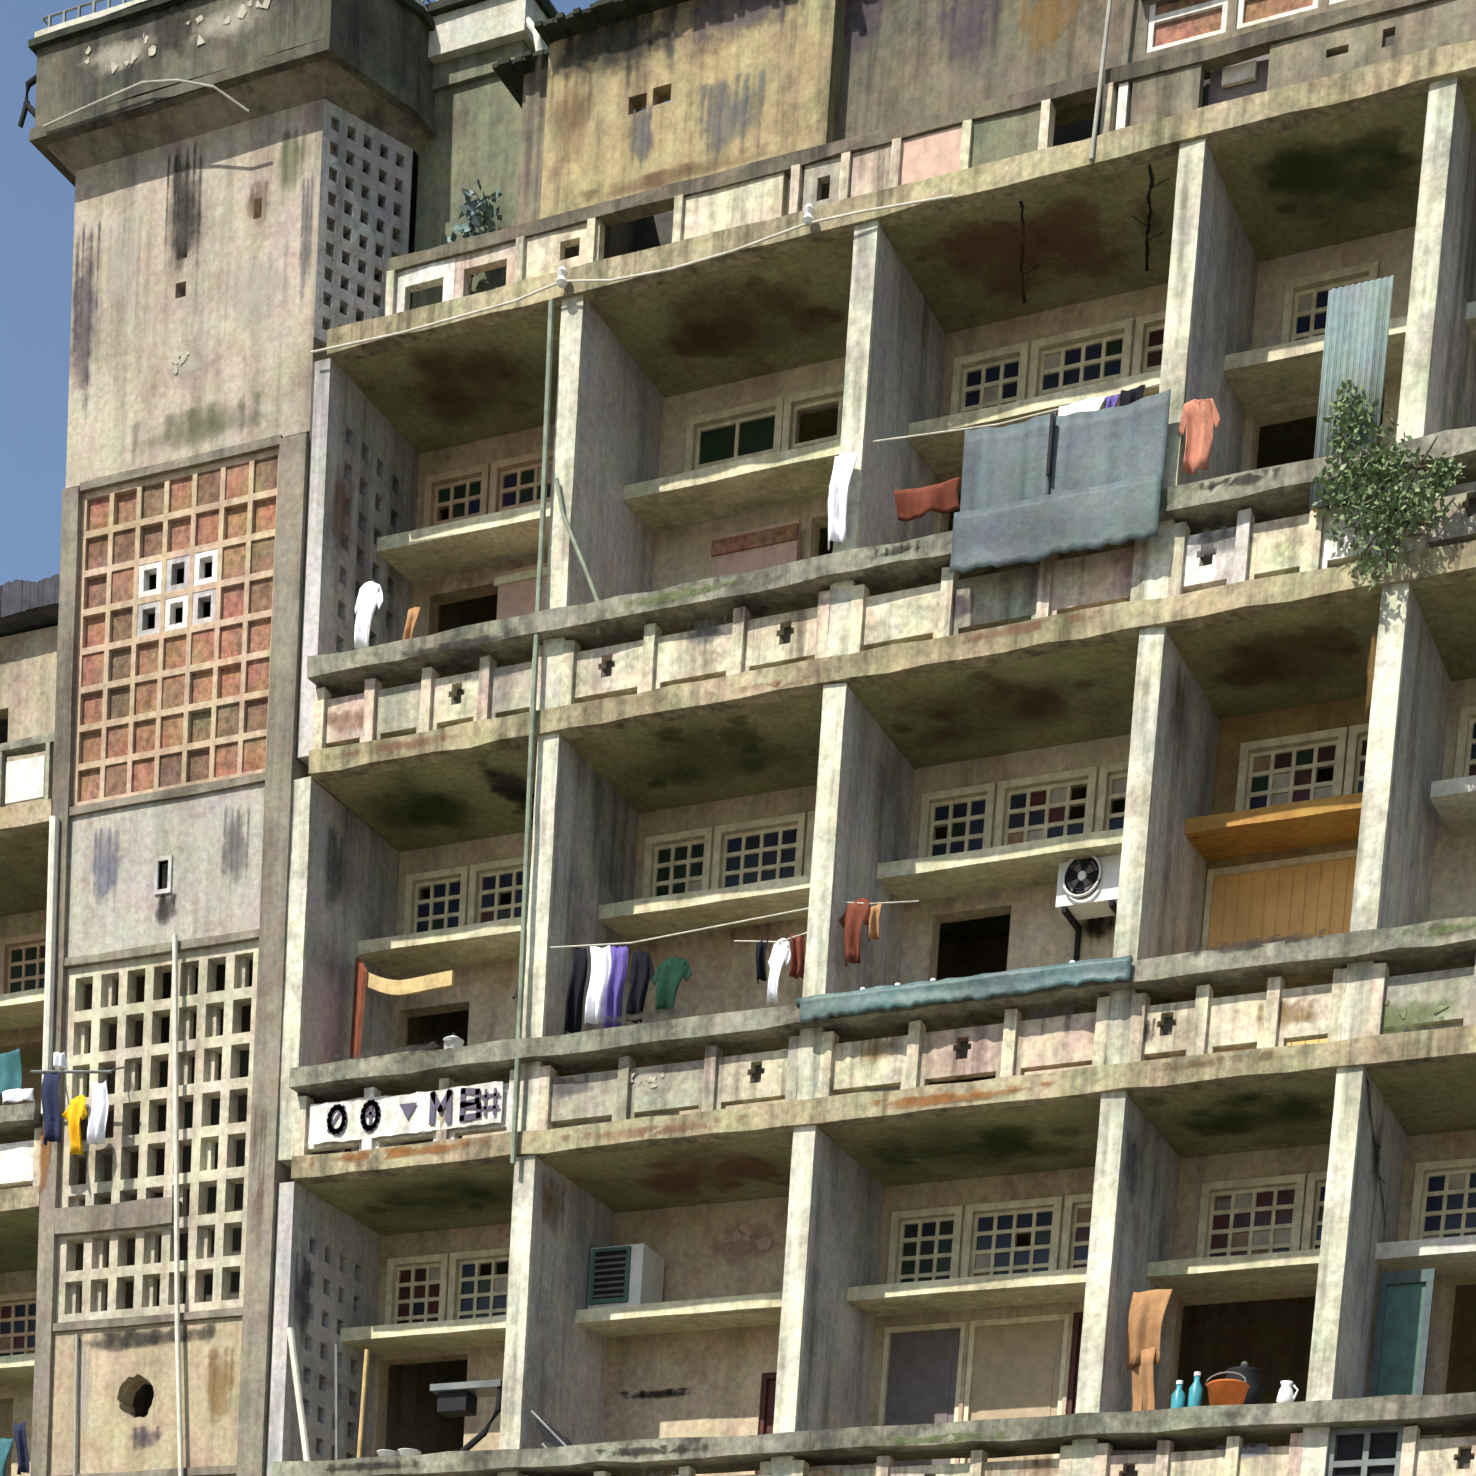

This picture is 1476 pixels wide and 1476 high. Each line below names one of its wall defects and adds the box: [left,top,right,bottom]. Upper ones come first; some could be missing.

peeling [84,33,157,74]
peeling [186,0,271,46]
water stain [632,106,652,156]
water stain [701,71,764,149]
water stain [166,145,201,266]
crack [1131,164,1170,271]
crack [1009,201,1039,303]
water stain [73,215,139,384]
water stain [94,829,117,896]
water stain [223,809,249,873]
rust [874,1086,1018,1108]